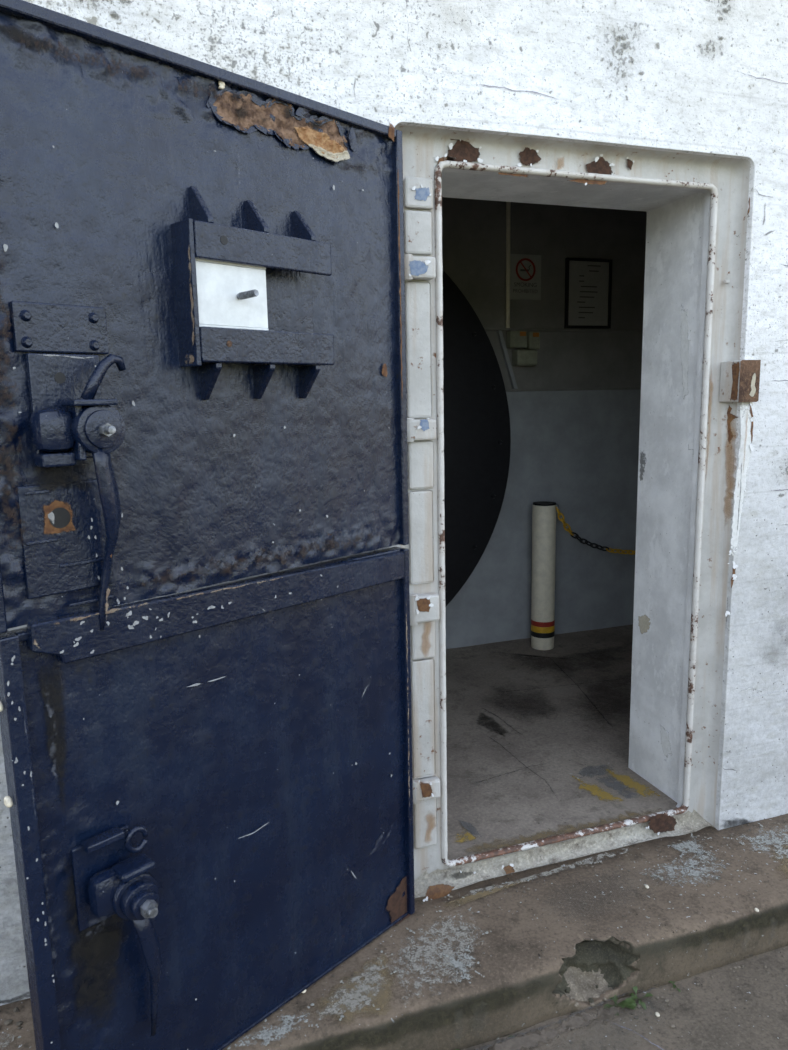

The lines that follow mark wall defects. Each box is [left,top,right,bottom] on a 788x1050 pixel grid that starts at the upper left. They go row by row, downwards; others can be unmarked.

peeling [206,88,357,164]
rust [725,360,761,511]
rust [43,500,76,534]
rust [646,813,677,835]
rust [386,877,410,925]
rust [423,884,455,902]
peeling [640,823,788,909]
peeling [227,846,639,1049]